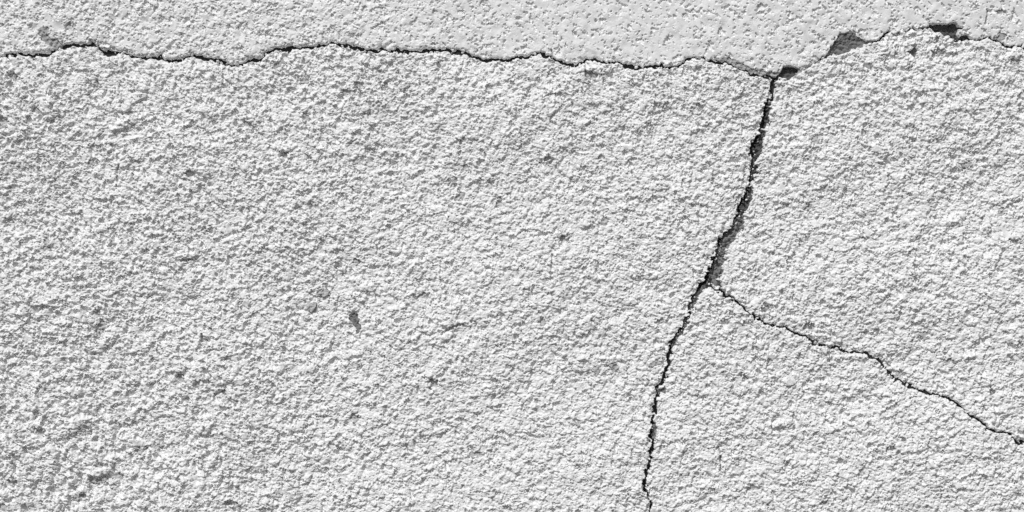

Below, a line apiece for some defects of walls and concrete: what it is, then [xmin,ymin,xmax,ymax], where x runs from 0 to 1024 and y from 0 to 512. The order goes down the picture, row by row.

crack [874,10,1024,50]
crack [0,42,1024,446]
crack [642,312,690,510]